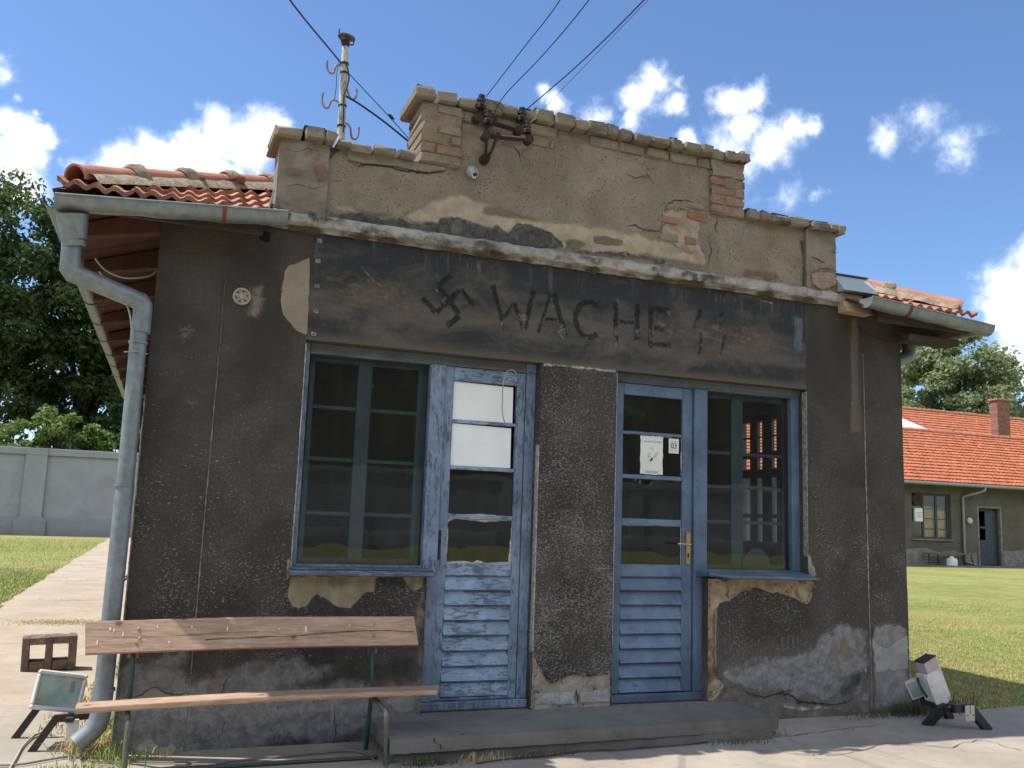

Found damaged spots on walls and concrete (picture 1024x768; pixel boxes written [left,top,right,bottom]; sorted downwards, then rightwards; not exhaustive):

crack [287,148,442,174]
crack [630,200,718,266]
flaking render [658,201,707,266]
flaking render [280,256,377,609]
flaking render [706,392,816,702]
crack [745,690,849,707]
water stain [722,623,909,711]